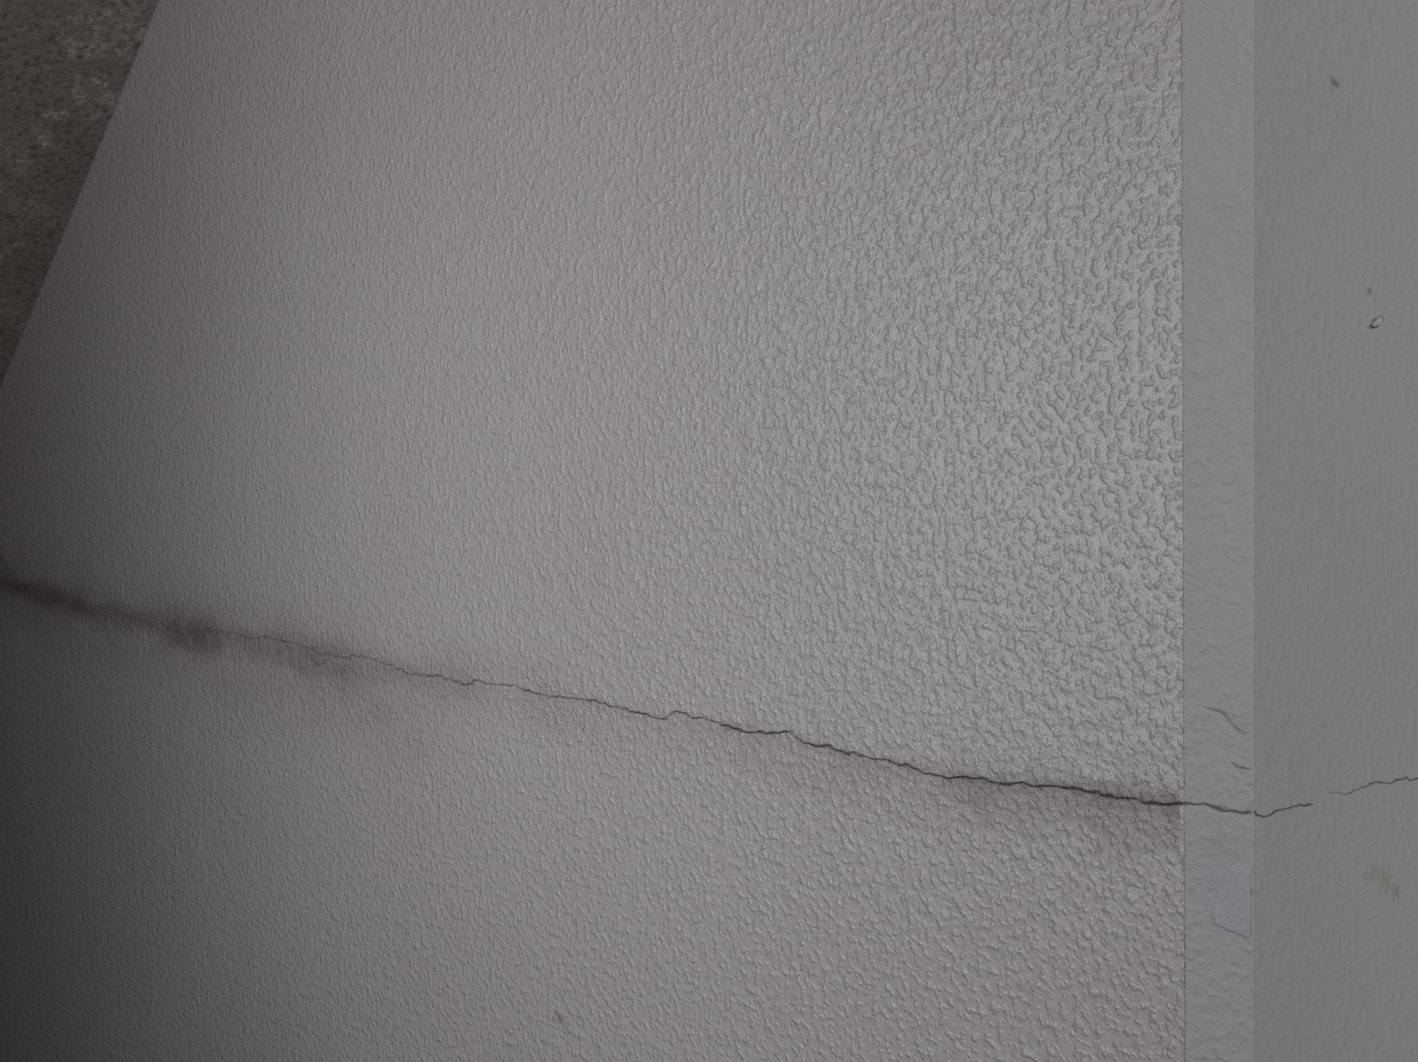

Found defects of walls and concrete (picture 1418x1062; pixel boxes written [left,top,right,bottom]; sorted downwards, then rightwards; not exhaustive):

crack [429,675,1313,817]
crack [1349,776,1418,794]